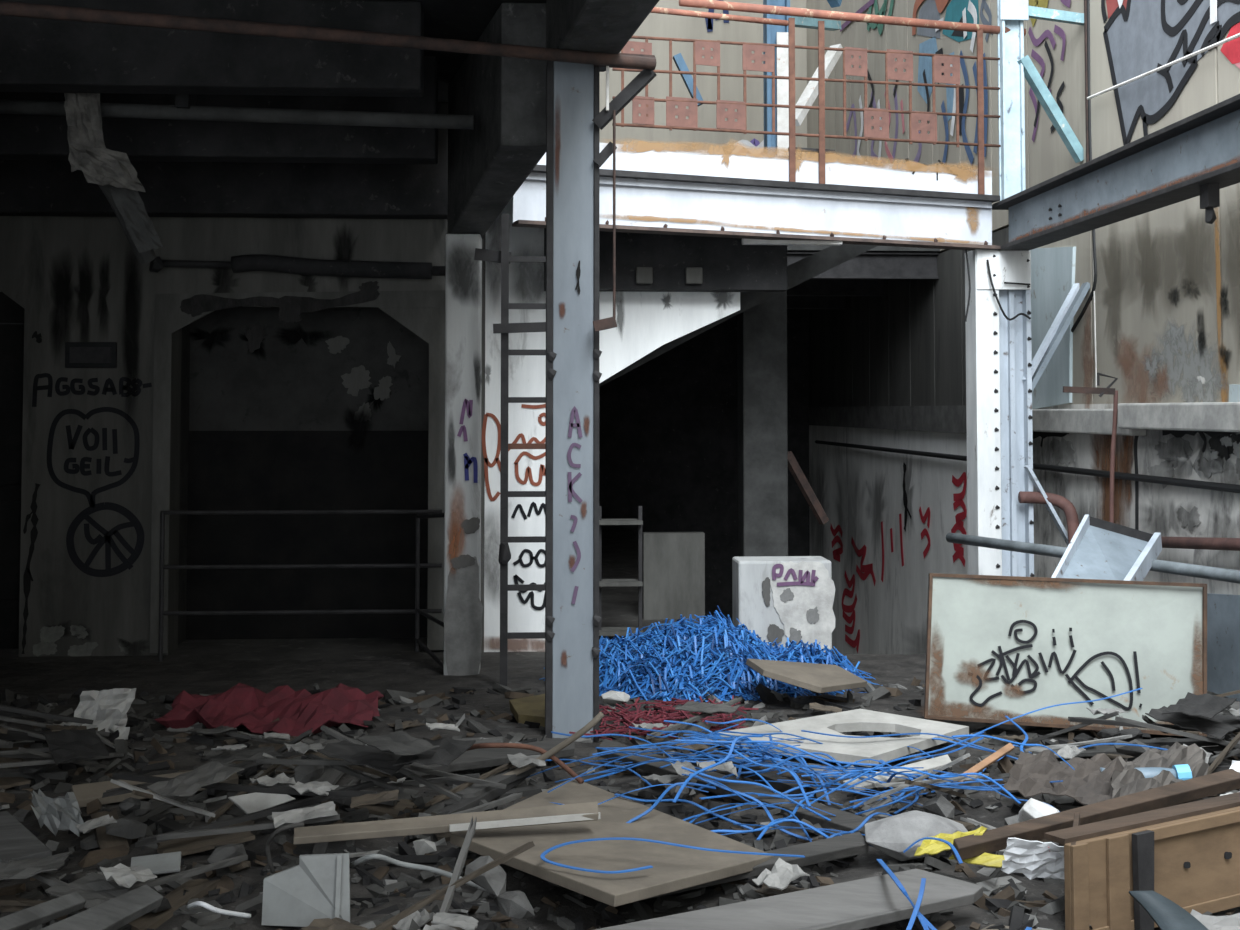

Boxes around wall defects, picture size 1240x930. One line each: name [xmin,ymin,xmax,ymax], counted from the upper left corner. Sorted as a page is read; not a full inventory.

rust [621,140,978,182]
leakage [52,261,109,347]
leakage [124,258,140,406]
leakage [1104,228,1212,341]
leakage [1144,313,1230,403]
leakage [1220,222,1240,325]